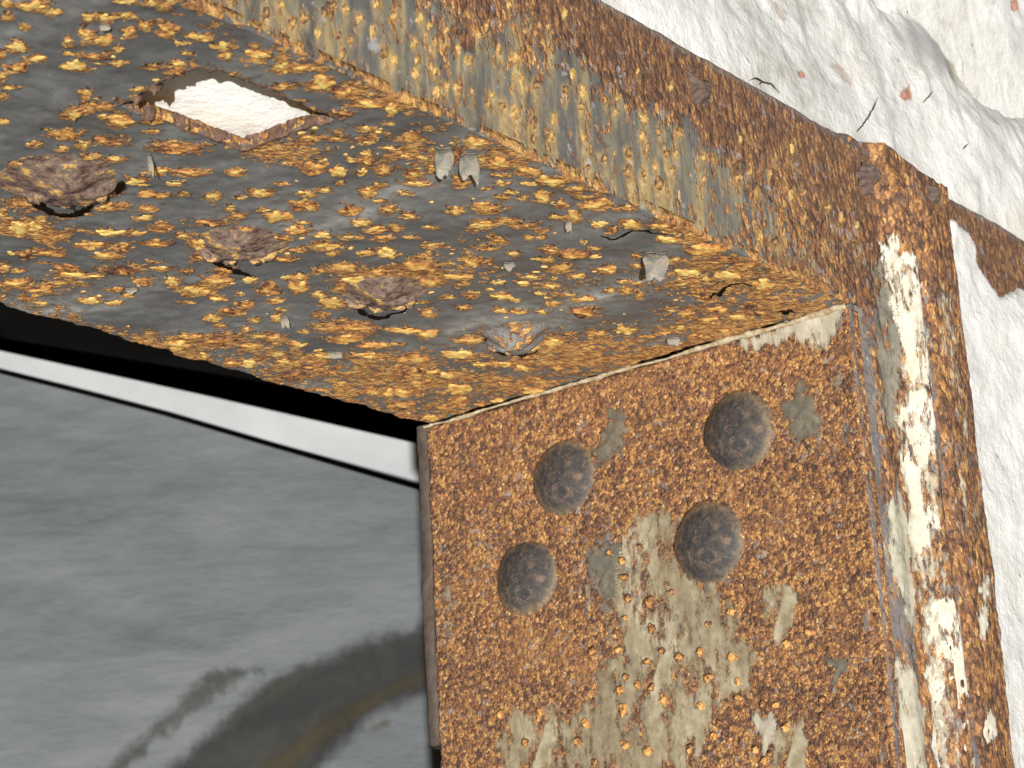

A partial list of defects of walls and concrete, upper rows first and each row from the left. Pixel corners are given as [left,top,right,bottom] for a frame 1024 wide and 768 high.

rust [0,42,48,95]
rust [1,0,62,30]
rust [61,0,230,91]
rust [262,0,399,65]
rust [410,12,474,98]
rust [474,19,491,40]
rust [496,43,540,89]
rust [0,50,775,422]